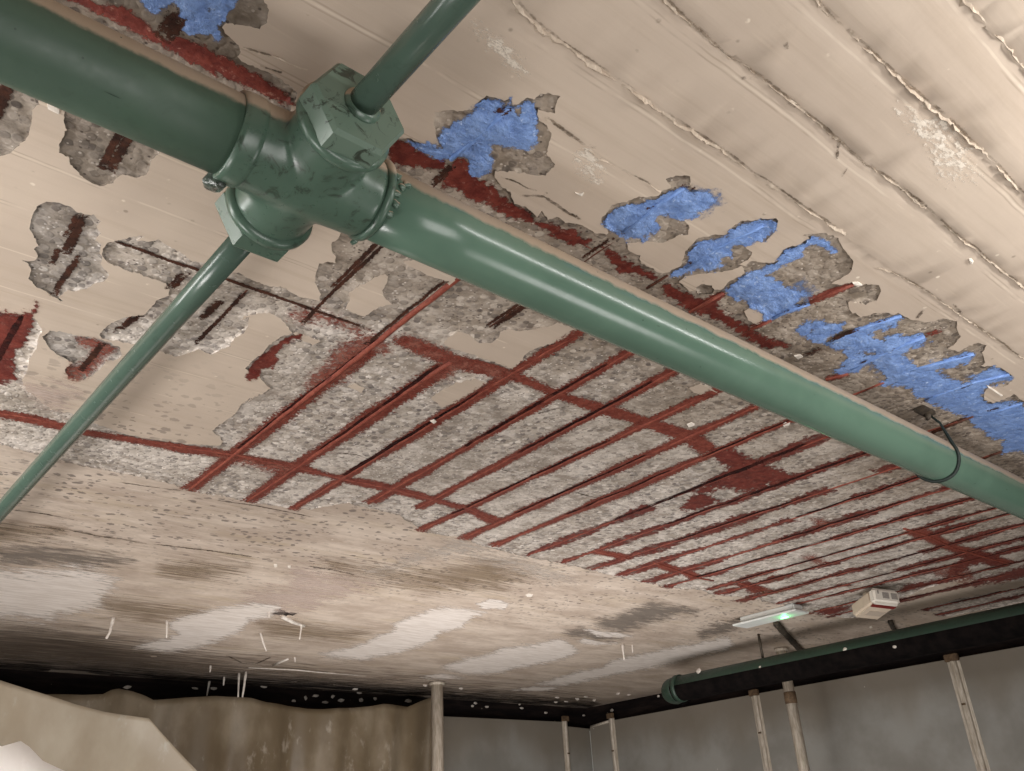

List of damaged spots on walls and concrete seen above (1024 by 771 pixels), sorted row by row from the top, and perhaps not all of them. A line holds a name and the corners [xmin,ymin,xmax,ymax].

rust [154,7,187,44]
spalling [0,84,160,186]
spalling [0,202,205,455]
rust [113,241,200,292]
rust [195,244,449,345]
rust [485,304,526,329]
spalling [387,93,1024,479]
spalling [60,233,1024,618]
leakage [0,523,135,571]
leakage [244,540,575,640]
leakage [564,602,697,642]
leakage [700,619,740,639]